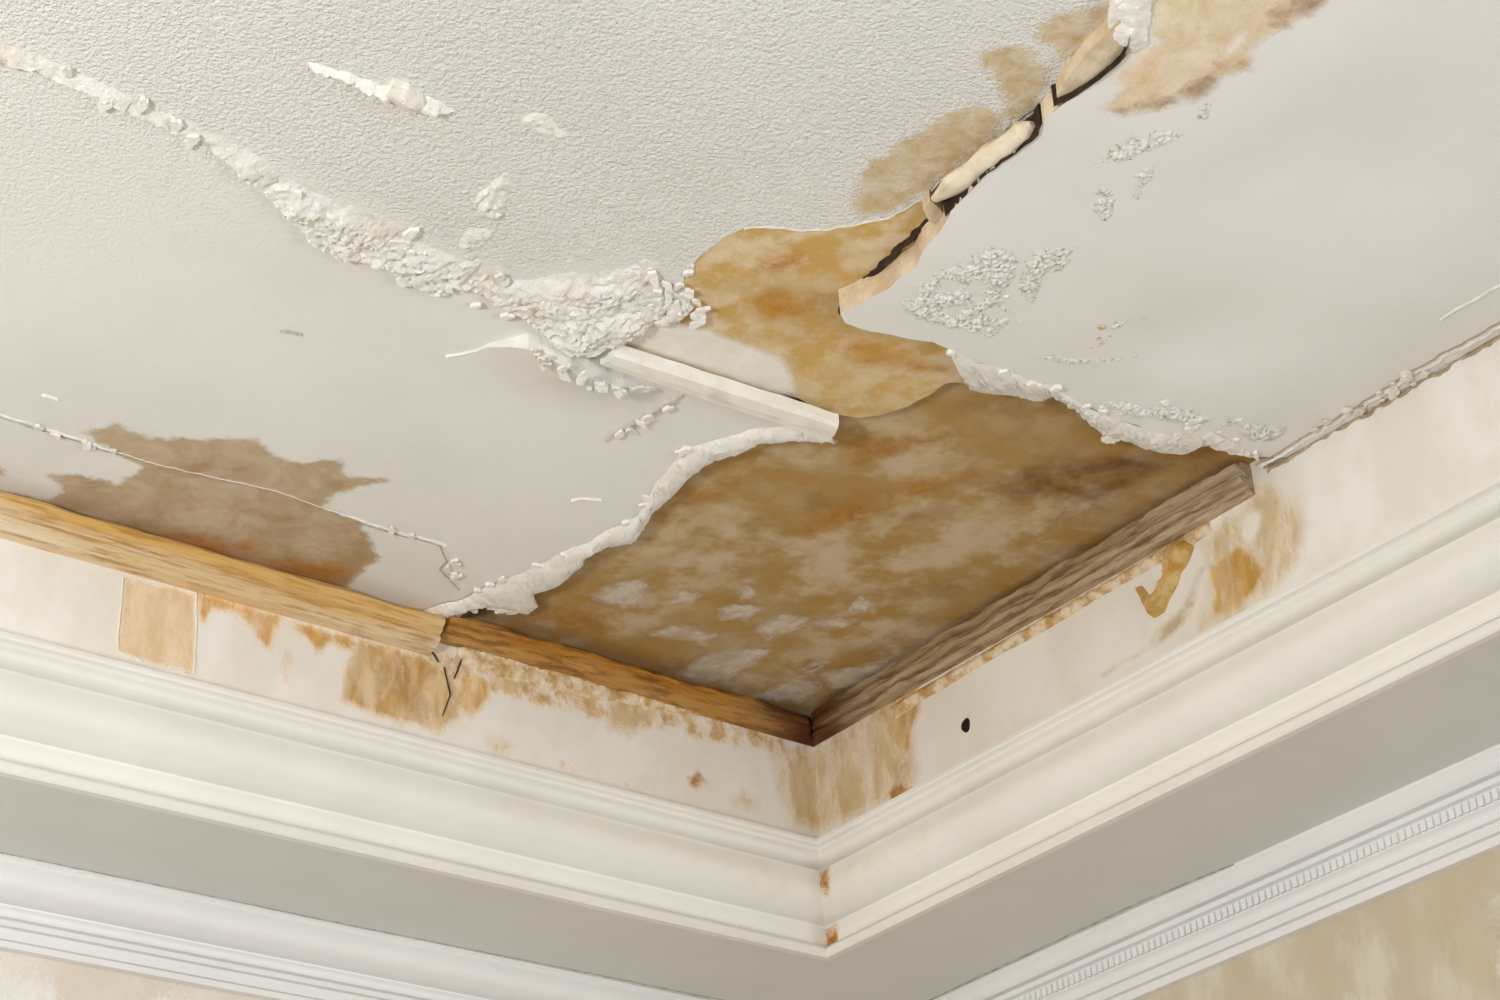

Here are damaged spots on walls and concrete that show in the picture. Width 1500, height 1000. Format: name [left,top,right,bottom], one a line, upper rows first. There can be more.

damp [1112,0,1326,114]
crack [838,38,1130,315]
peeling [0,40,1289,492]
damp [14,425,384,587]
crack [0,413,466,591]
damp [200,594,278,646]
crack [432,652,463,716]
damp [303,627,916,825]
spalling [421,427,838,625]
spalling [660,586,806,680]
spalling [757,651,913,701]
damp [1213,491,1299,616]